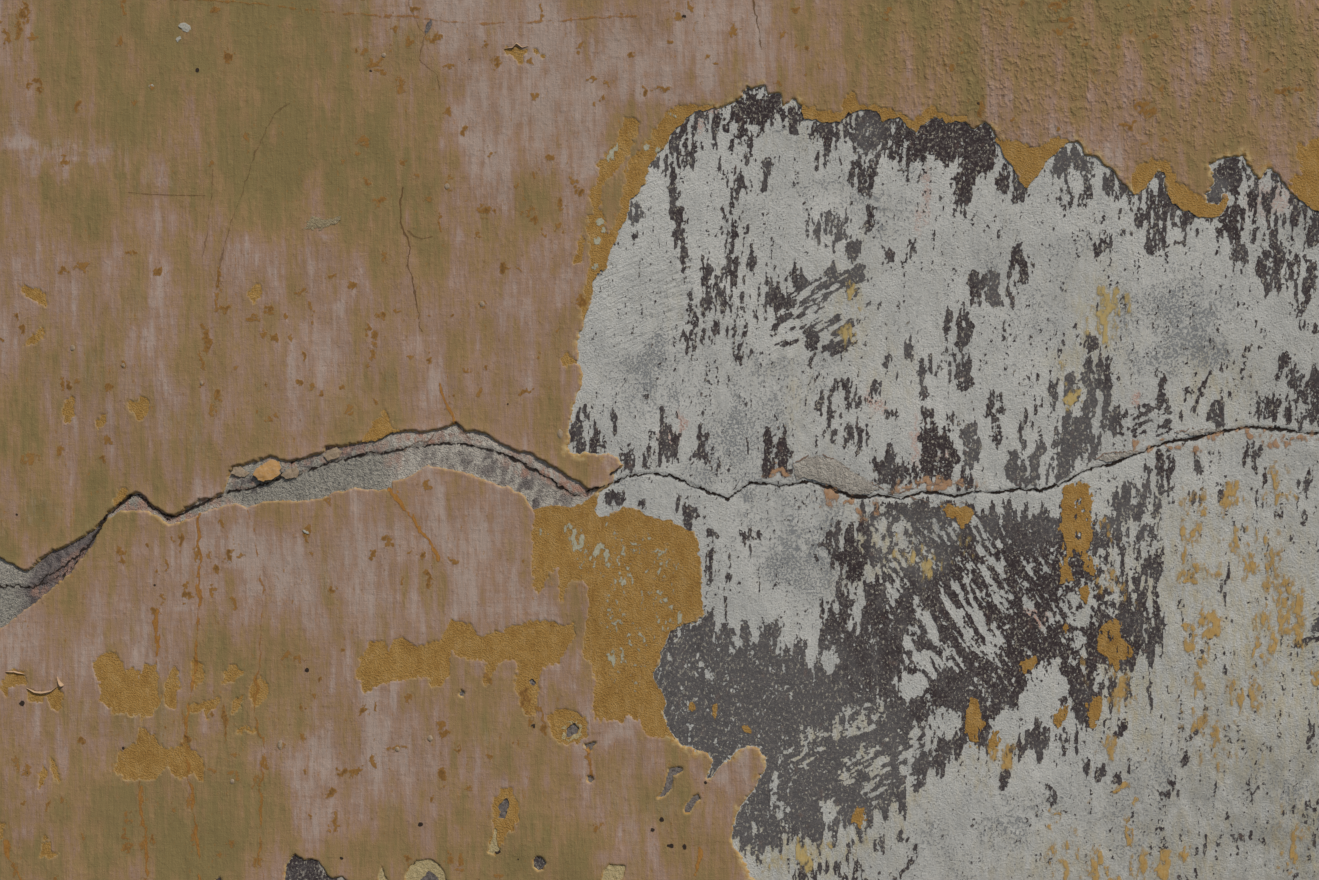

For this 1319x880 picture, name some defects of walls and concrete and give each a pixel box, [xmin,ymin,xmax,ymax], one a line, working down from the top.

crack [0,421,1319,589]
peeling [561,85,1319,880]
peeling [108,410,704,740]
peeling [0,668,64,711]
peeling [93,652,268,781]
peeling [547,708,596,750]
peeling [488,787,520,856]
peeling [285,854,345,880]
peeling [406,859,446,880]
peeling [534,856,546,870]